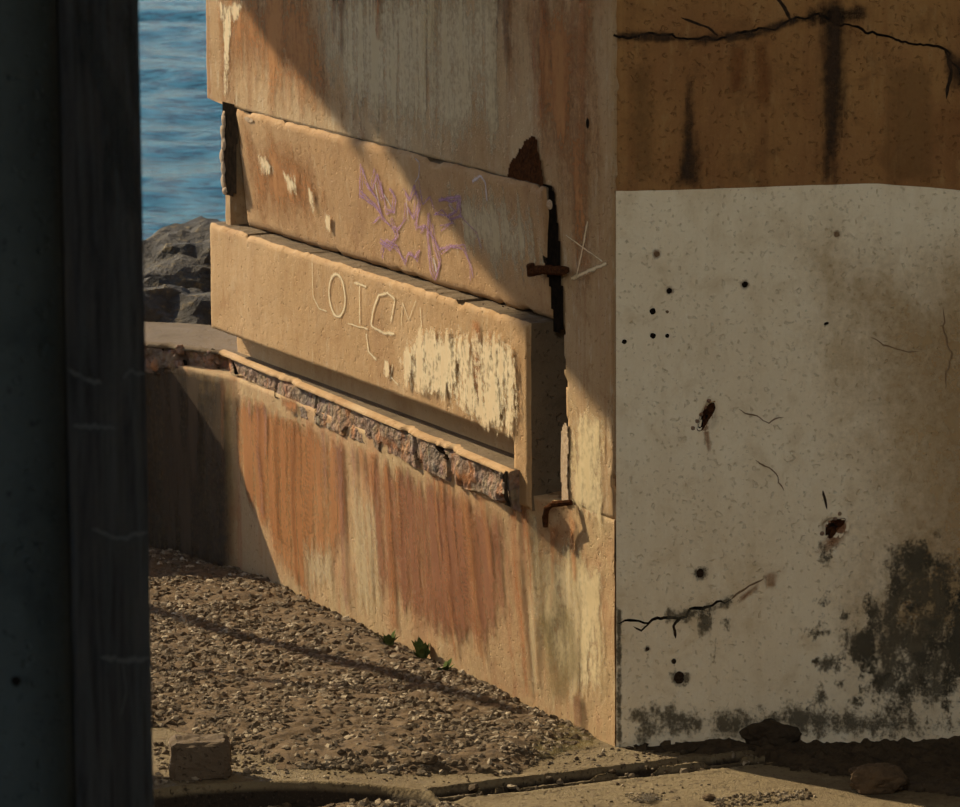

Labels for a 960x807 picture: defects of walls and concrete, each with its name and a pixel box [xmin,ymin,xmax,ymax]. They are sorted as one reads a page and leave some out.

crack [613,0,960,99]
water stain [809,1,864,178]
spalling [507,136,543,187]
corrosion [236,398,346,597]
peeling [384,327,517,437]
water stain [571,414,604,525]
hole [691,399,715,447]
hole [820,491,846,547]
water stain [759,290,960,739]
water stain [530,519,604,727]
water stain [616,608,701,743]
crack [621,579,763,638]